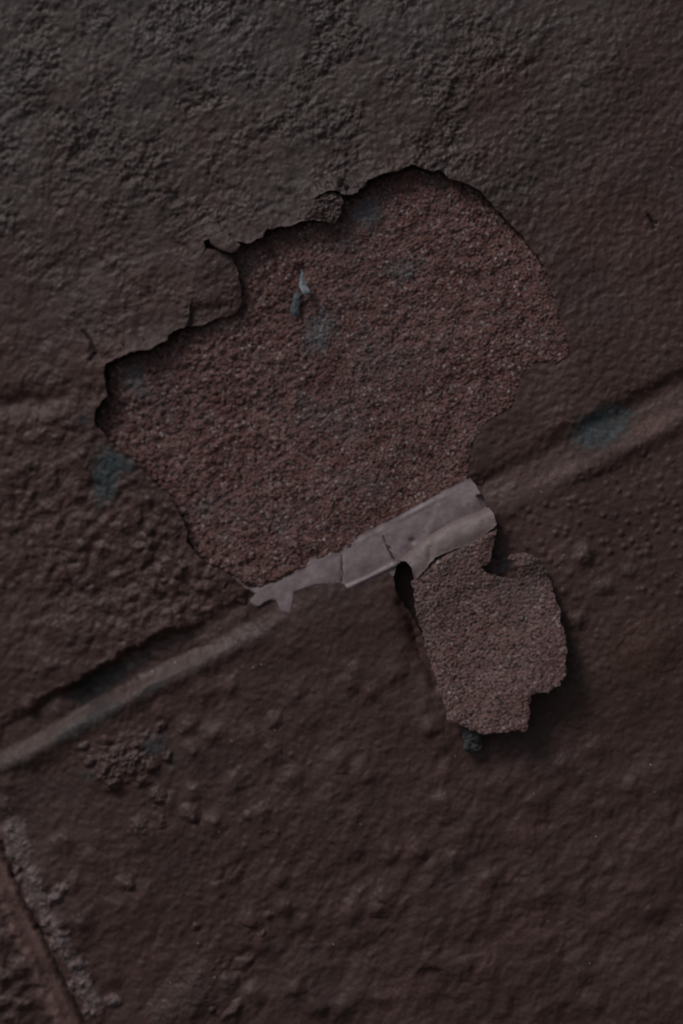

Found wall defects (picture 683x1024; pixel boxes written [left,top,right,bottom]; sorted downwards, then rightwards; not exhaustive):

peeling [94,164,569,613]
peeling [607,405,683,451]